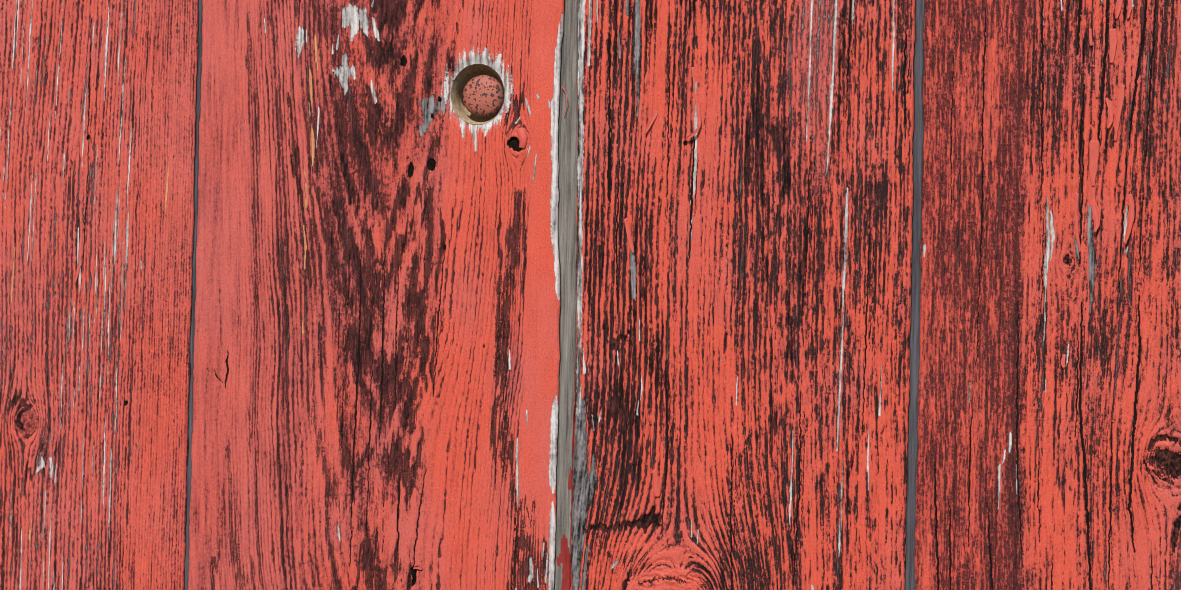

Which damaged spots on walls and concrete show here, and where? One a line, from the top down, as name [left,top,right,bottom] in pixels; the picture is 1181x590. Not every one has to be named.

peeling [295,26,320,208]
peeling [332,0,381,96]
peeling [419,14,563,300]
peeling [515,0,601,590]